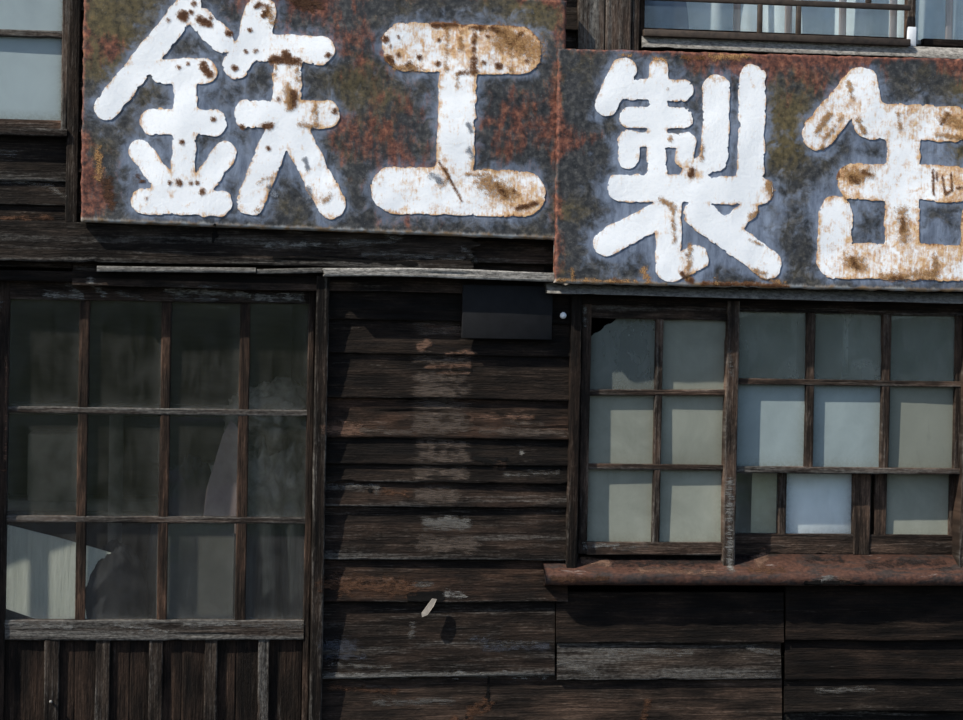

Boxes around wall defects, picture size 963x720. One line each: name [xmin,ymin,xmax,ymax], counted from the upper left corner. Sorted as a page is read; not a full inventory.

corrosion [167,0,214,28]
corrosion [253,2,276,28]
corrosion [176,61,214,79]
corrosion [268,49,302,112]
corrosion [381,21,545,87]
corrosion [814,111,866,150]
corrosion [168,179,206,195]
corrosion [465,169,539,211]
corrosion [841,166,875,184]
corrosion [658,198,677,242]
corrosion [894,206,910,243]
corrosion [842,255,868,271]